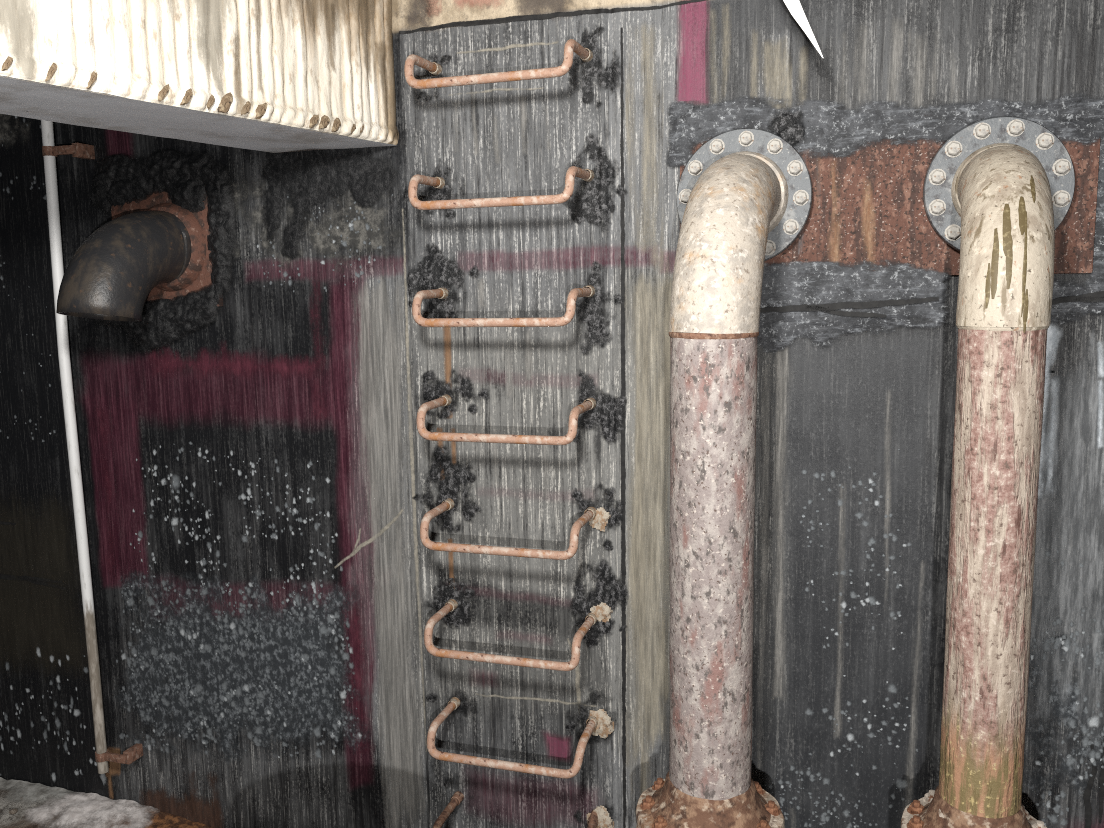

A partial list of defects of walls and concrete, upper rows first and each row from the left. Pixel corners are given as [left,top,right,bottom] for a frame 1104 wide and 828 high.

leakage [0,0,35,78]
leakage [193,0,227,90]
leakage [235,43,246,115]
leakage [306,0,373,69]
leakage [116,442,363,760]
leakage [0,515,147,828]
leakage [1026,604,1104,826]